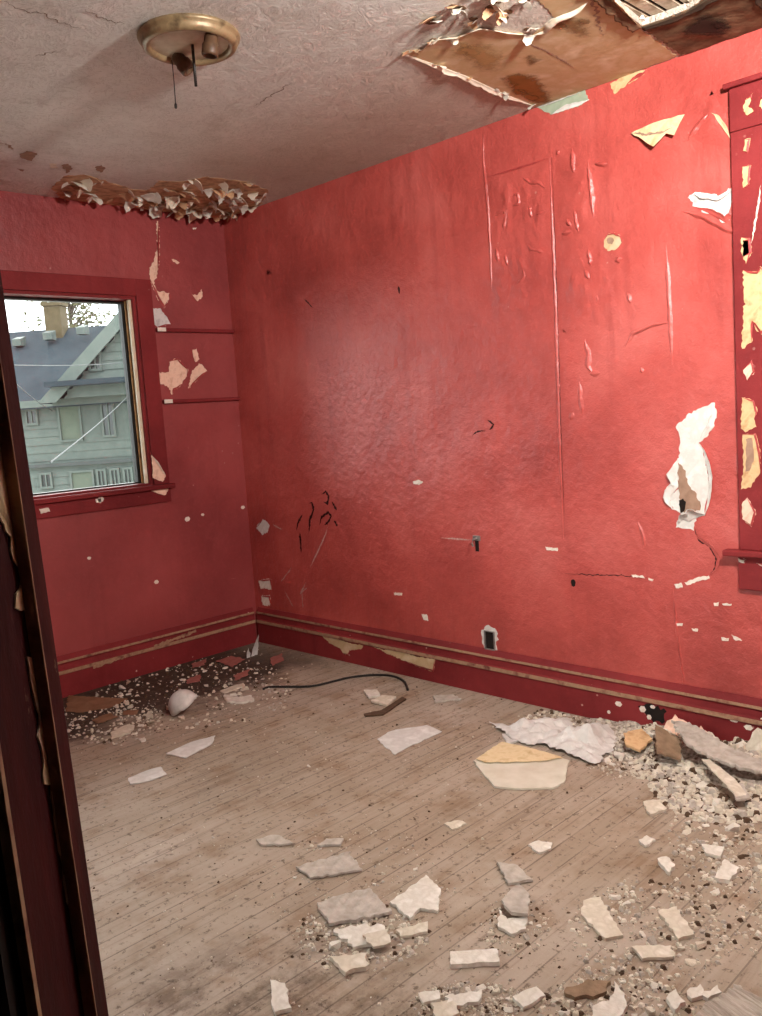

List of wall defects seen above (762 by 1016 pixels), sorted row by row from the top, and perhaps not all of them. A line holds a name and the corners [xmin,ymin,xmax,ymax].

damp [684,15,730,36]
peeling [402,0,762,110]
damp [502,74,549,104]
peeling [743,93,762,115]
peeling [51,164,268,328]
peeling [741,237,762,349]
peeling [159,349,207,394]
peeling [740,397,761,527]
peeling [323,636,435,672]